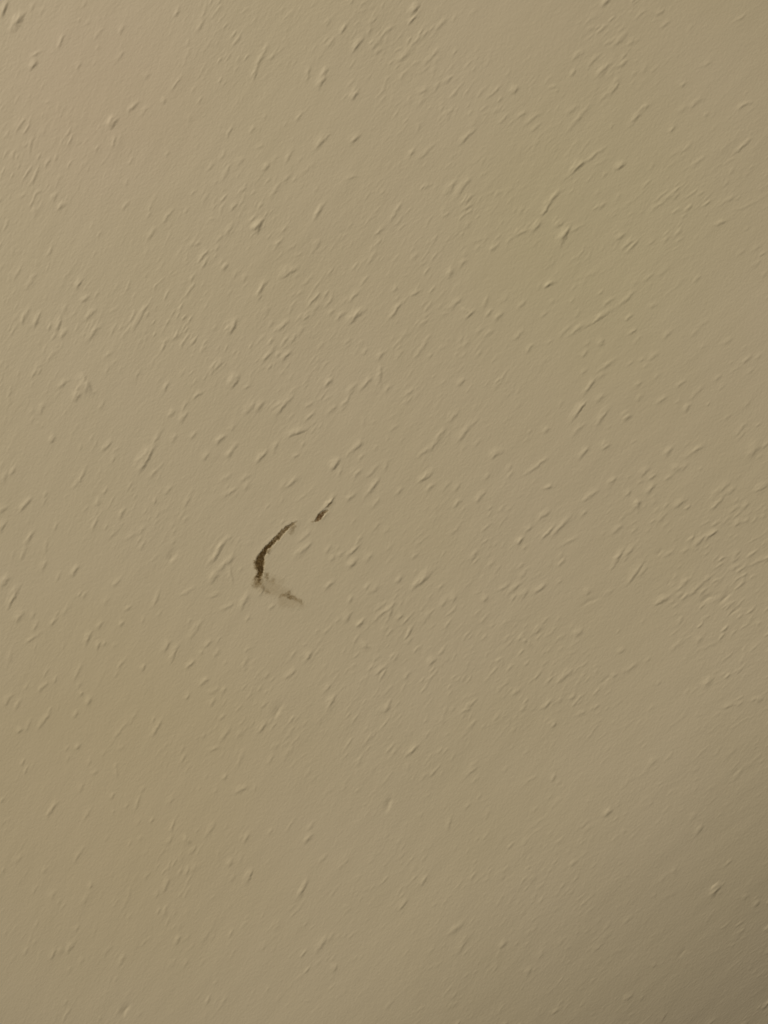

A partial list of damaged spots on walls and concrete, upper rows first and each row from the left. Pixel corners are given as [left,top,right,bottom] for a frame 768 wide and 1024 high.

crack [248,498,336,611]